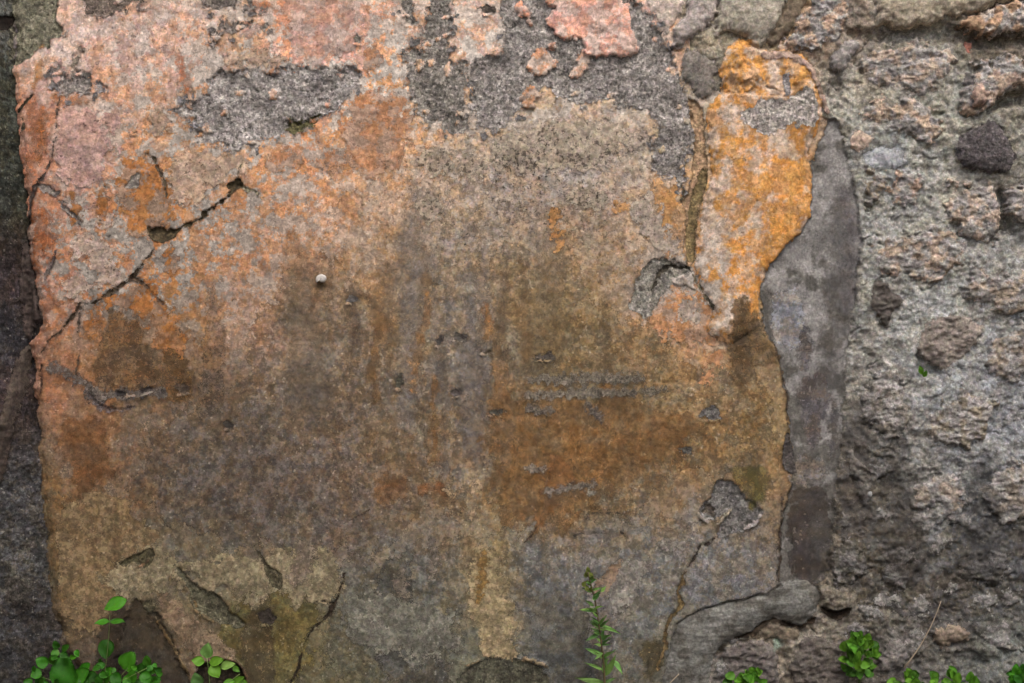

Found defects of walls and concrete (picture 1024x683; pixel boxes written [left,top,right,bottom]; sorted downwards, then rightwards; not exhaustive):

crack [18,94,33,133]
crack [27,97,81,229]
crack [125,155,167,197]
flaking render [30,0,726,386]
crack [39,164,259,395]
flaking render [699,479,763,540]
crack [656,538,715,671]